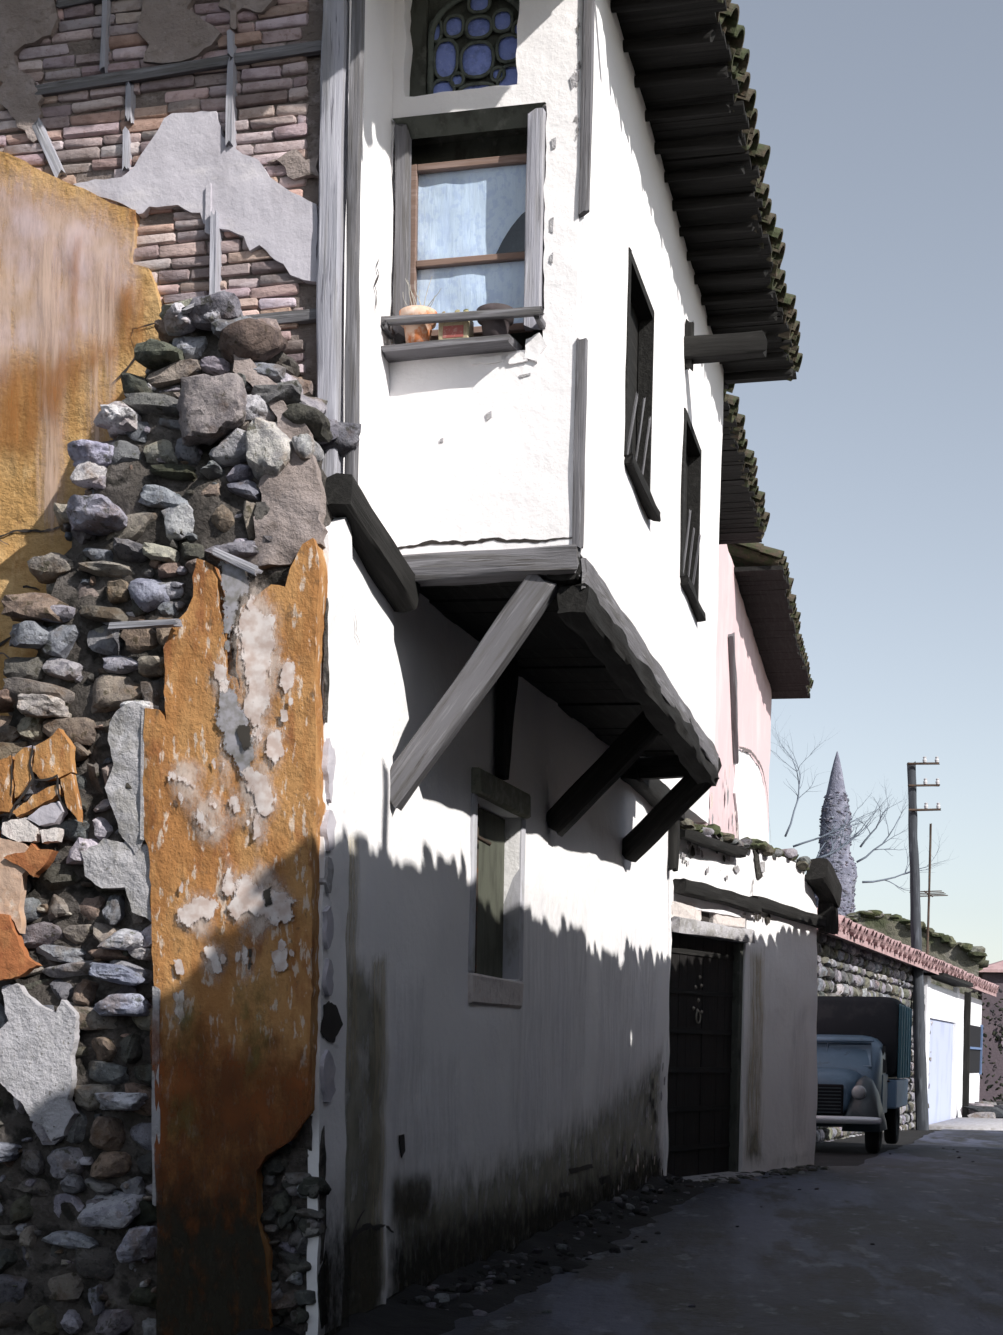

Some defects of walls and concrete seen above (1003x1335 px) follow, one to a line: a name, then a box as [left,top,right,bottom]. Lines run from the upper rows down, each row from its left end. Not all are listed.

flaking render [0,0,322,379]
damp [39,241,60,526]
efflorescence [94,262,115,442]
crack [0,526,60,545]
peeling [168,561,295,845]
peeling [0,728,83,1141]
peeling [173,959,184,1024]
damp [156,1182,270,1335]
rust [150,1028,311,1331]
peeling [176,865,297,974]
damp [324,840,662,1335]